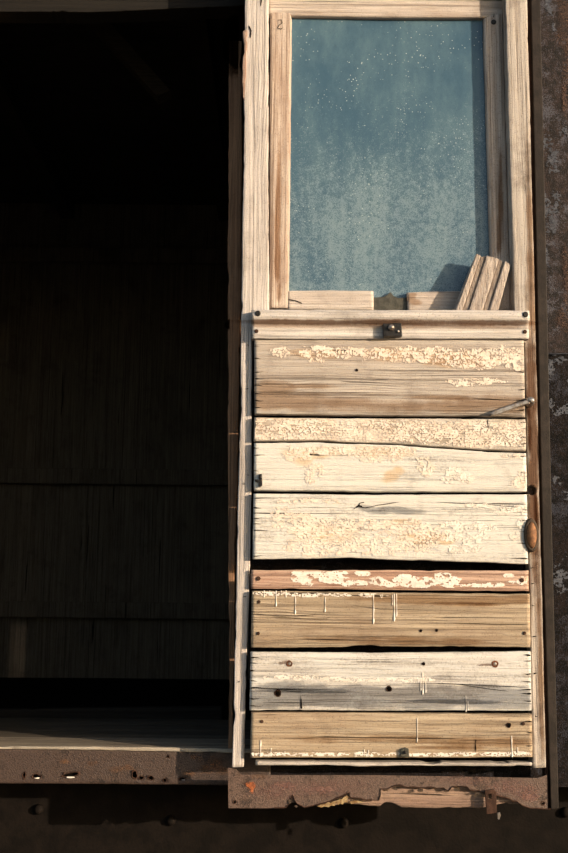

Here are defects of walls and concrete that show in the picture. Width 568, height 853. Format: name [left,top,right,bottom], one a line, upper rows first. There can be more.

peeling [269,345,523,387]
peeling [255,418,525,477]
peeling [509,470,526,488]
peeling [266,498,500,557]
peeling [467,502,527,541]
peeling [253,571,527,598]
corrosion [274,776,548,810]